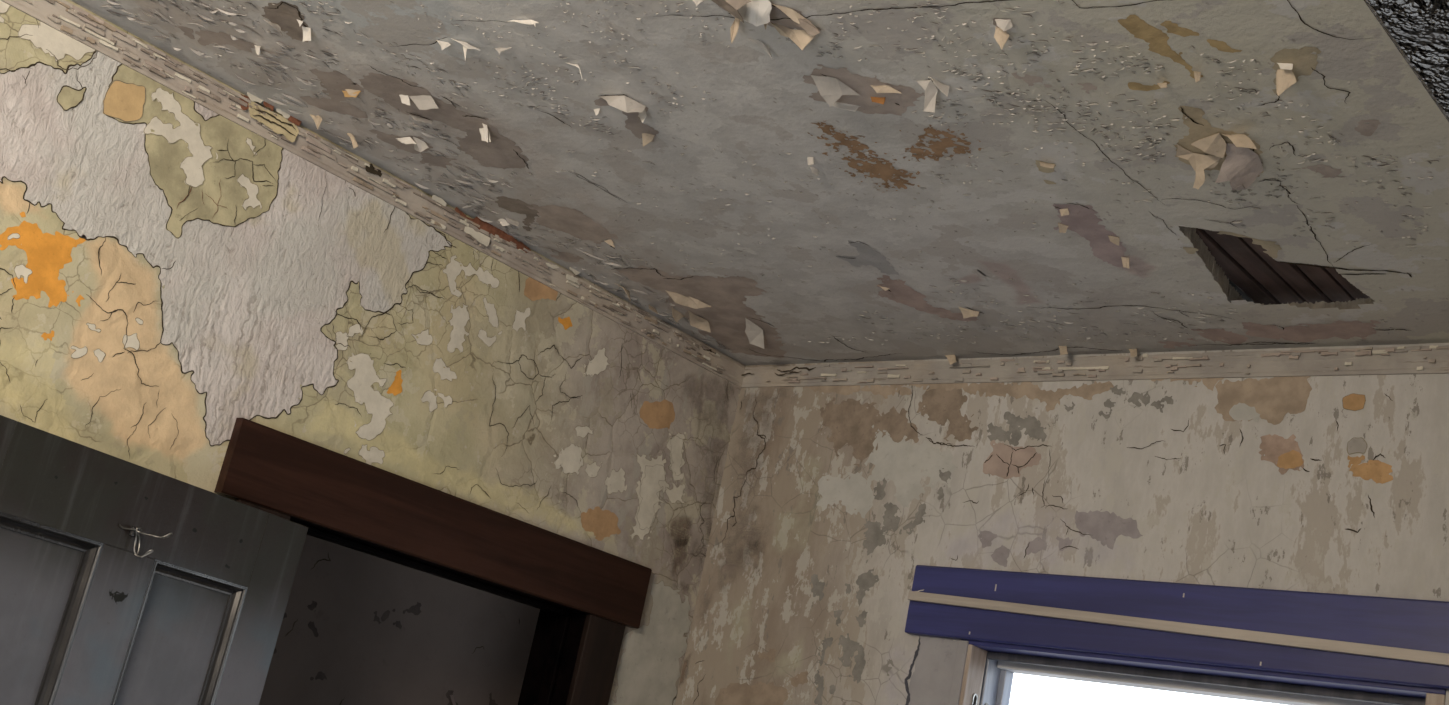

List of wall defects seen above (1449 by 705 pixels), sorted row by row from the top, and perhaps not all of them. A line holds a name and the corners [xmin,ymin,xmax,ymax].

peeling [692,0,821,51]
crack [770,0,1009,20]
crack [177,140,356,222]
peeling [0,0,787,465]
peeling [803,64,983,191]
crack [1030,98,1412,277]
crack [82,238,179,456]
leakage [671,518,690,569]
leakage [722,442,834,573]
peeling [781,320,1449,705]
leakage [713,582,820,690]
leakage [865,623,921,705]